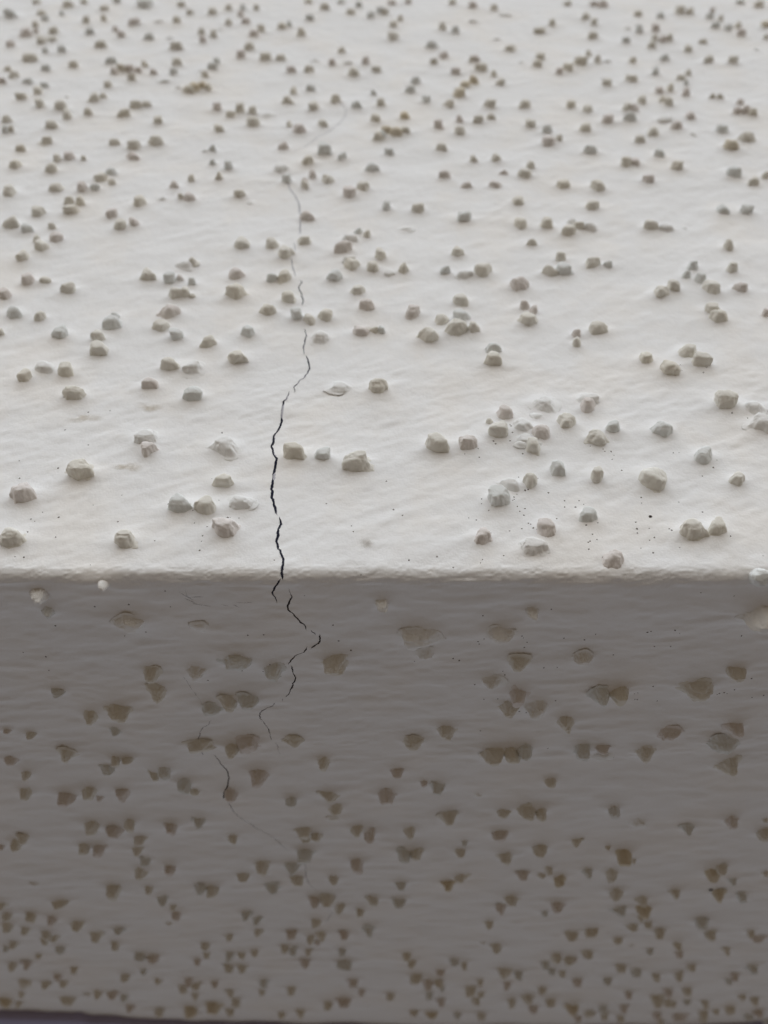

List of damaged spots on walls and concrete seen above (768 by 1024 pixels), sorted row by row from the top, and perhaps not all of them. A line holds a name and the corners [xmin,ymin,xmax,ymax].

crack [259,183,322,751]
crack [198,722,315,889]